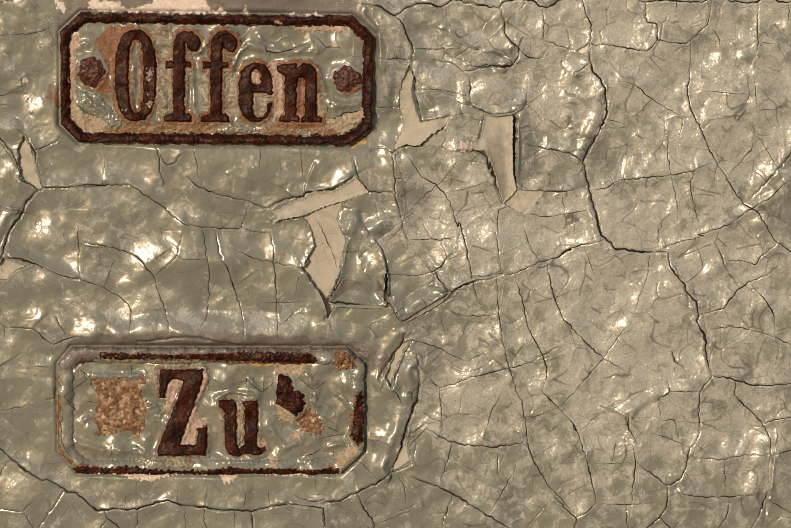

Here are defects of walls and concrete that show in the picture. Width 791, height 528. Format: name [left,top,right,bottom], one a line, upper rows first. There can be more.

peeling [88,0,226,16]
rust [55,0,364,45]
peeling [275,12,350,34]
rust [83,24,326,145]
peeling [67,24,365,146]
peeling [455,104,542,212]
crack [0,138,484,335]
peeling [272,177,389,317]
crack [296,0,791,528]
crack [0,314,92,367]
rust [55,330,389,474]
crack [0,448,287,528]